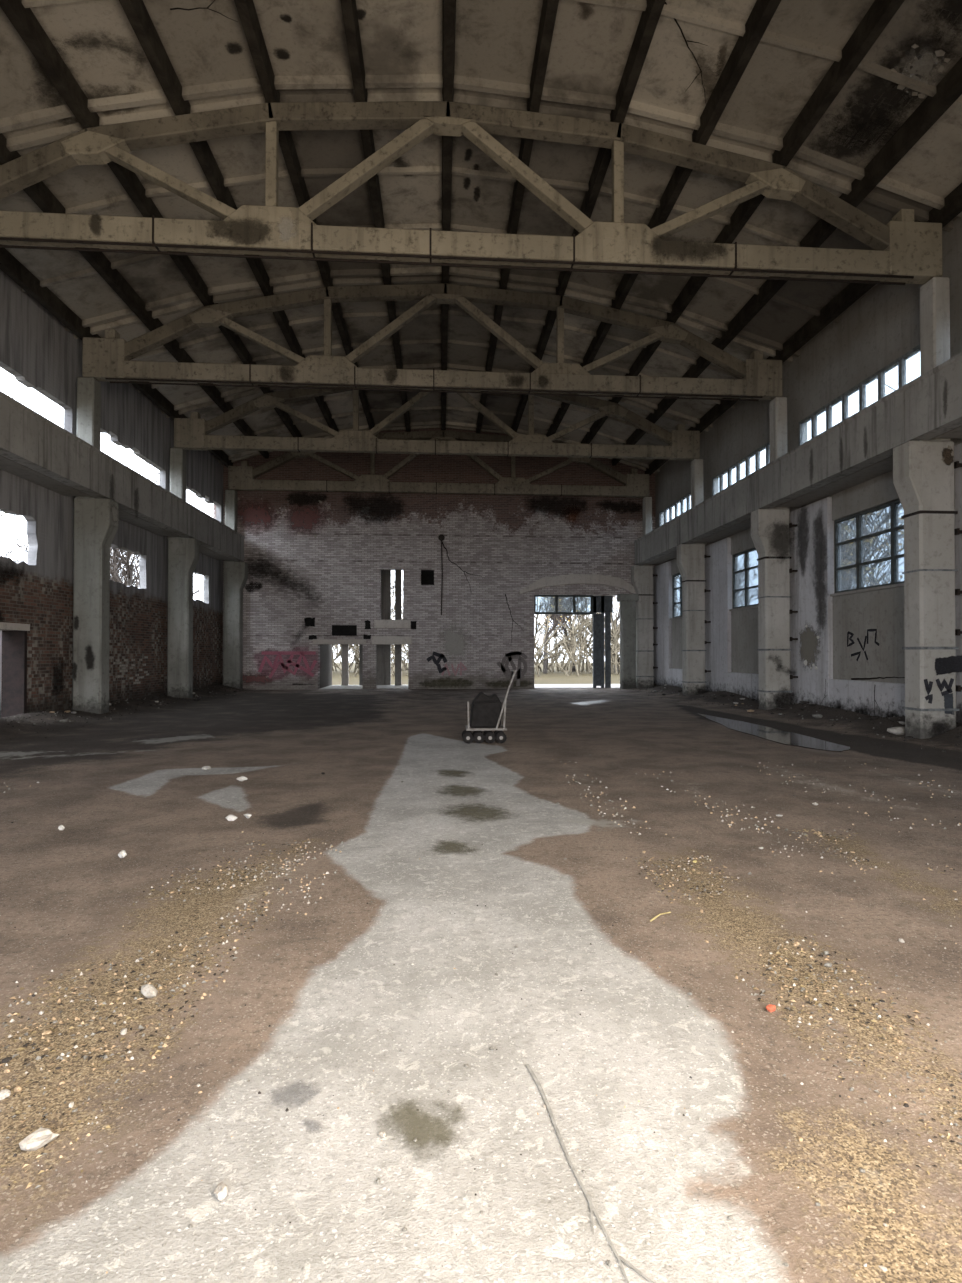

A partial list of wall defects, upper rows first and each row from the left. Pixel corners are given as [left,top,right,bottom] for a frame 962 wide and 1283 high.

water stain [771,508,827,628]